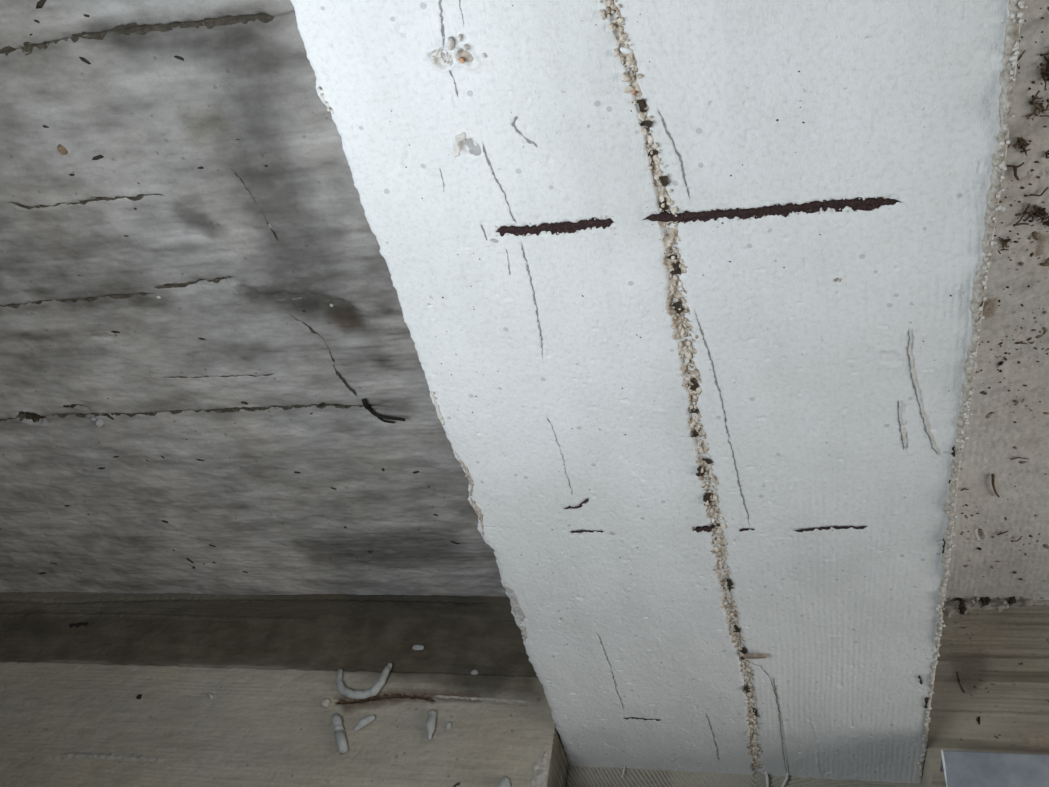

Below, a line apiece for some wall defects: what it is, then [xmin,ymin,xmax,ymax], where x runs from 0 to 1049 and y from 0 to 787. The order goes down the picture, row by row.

crack [0,12,275,56]
spalling [431,34,487,66]
crack [658,111,690,198]
rust [494,215,615,237]
rust [644,196,908,226]
crack [0,276,235,309]
crack [0,315,384,428]
crack [547,418,572,494]
crack [695,313,749,523]
crack [597,634,625,712]
crack [749,662,789,774]